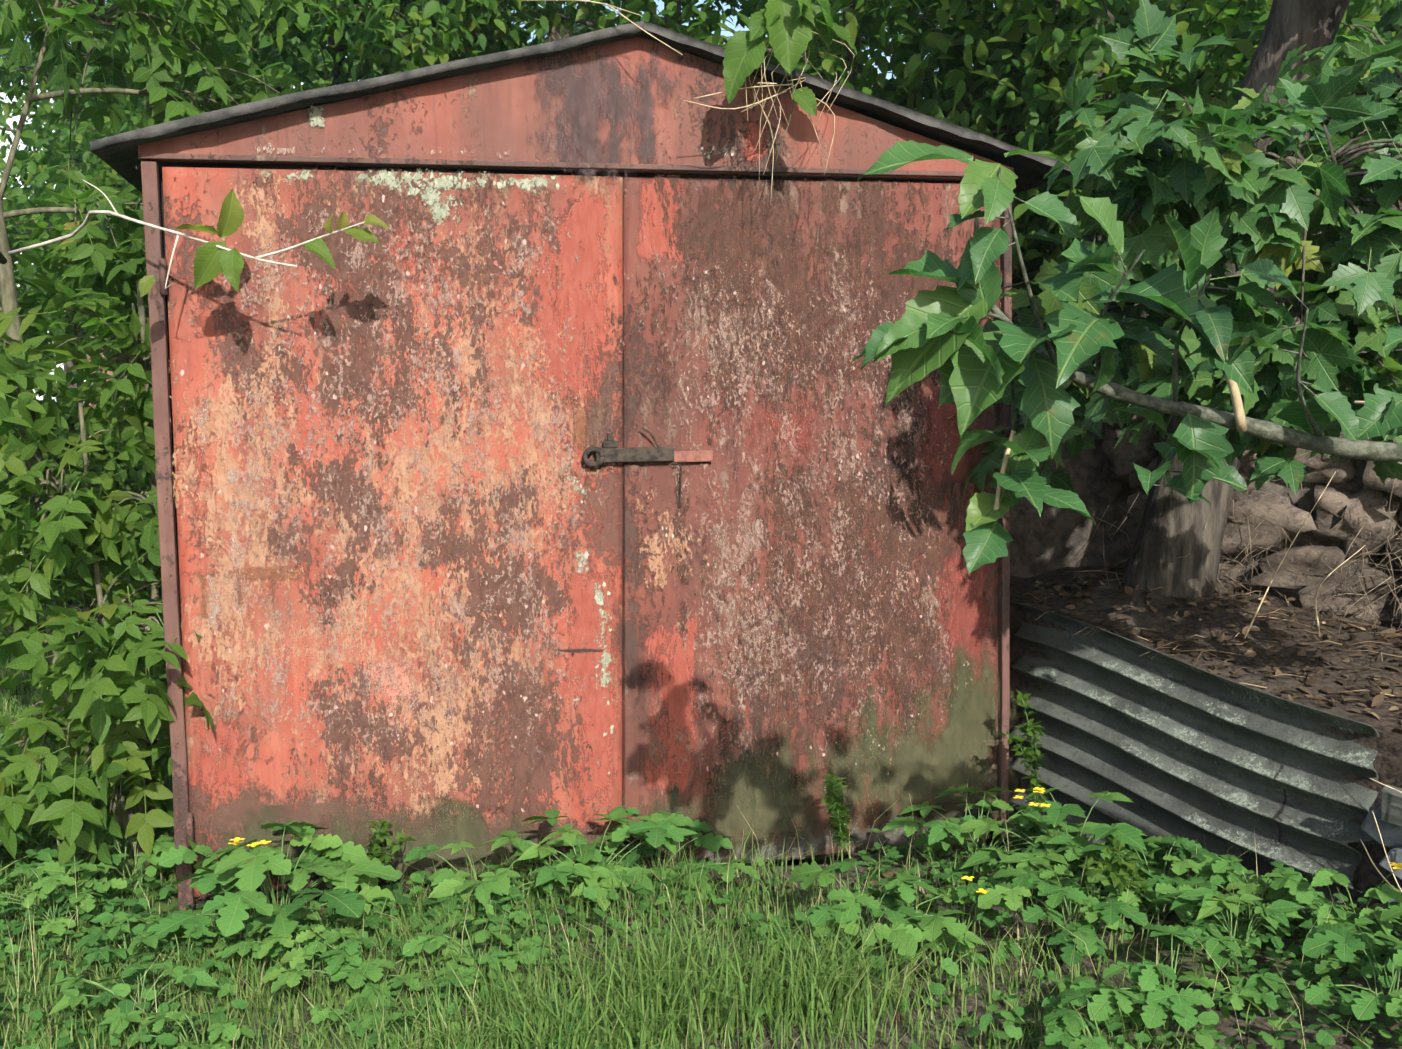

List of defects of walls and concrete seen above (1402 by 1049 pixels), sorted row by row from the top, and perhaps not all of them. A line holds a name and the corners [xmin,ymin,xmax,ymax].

corrosion [194,164,597,833]
corrosion [671,469,691,648]
leakage [525,33,1015,797]